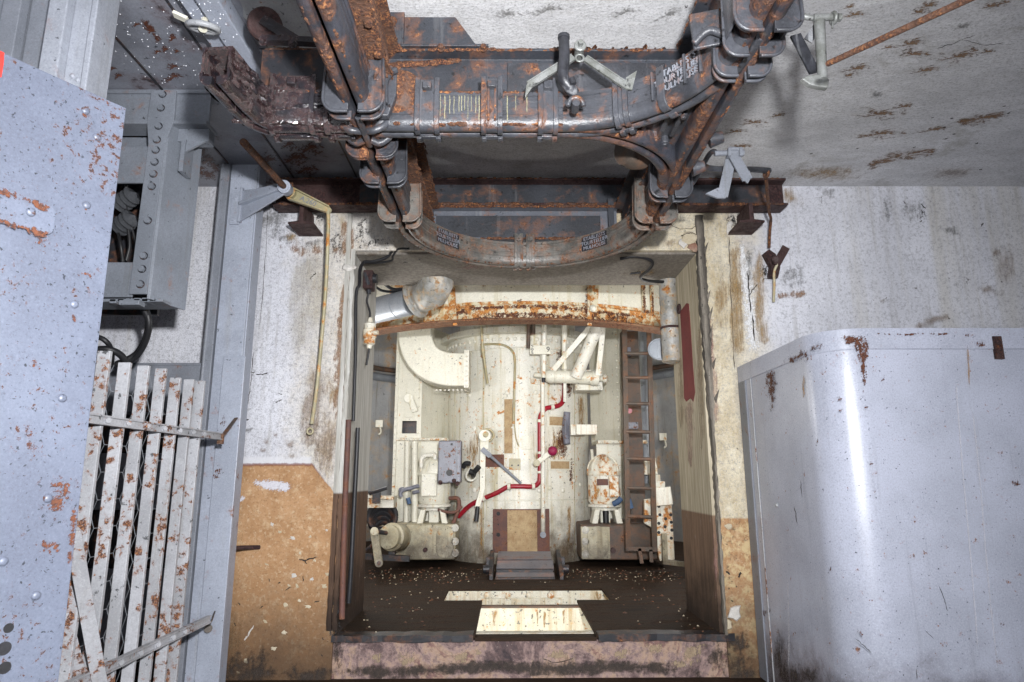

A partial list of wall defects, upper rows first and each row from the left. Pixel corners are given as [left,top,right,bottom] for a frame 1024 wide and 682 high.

corrosion [881,38,995,75]
corrosion [857,104,945,141]
corrosion [957,112,1008,127]
corrosion [200,149,220,180]
corrosion [261,142,324,177]
corrosion [869,149,934,169]
corrosion [289,222,354,259]
corrosion [451,287,655,330]
leakage [716,244,768,353]
corrosion [333,278,350,417]
leakage [347,658,677,679]
leakage [708,633,755,678]